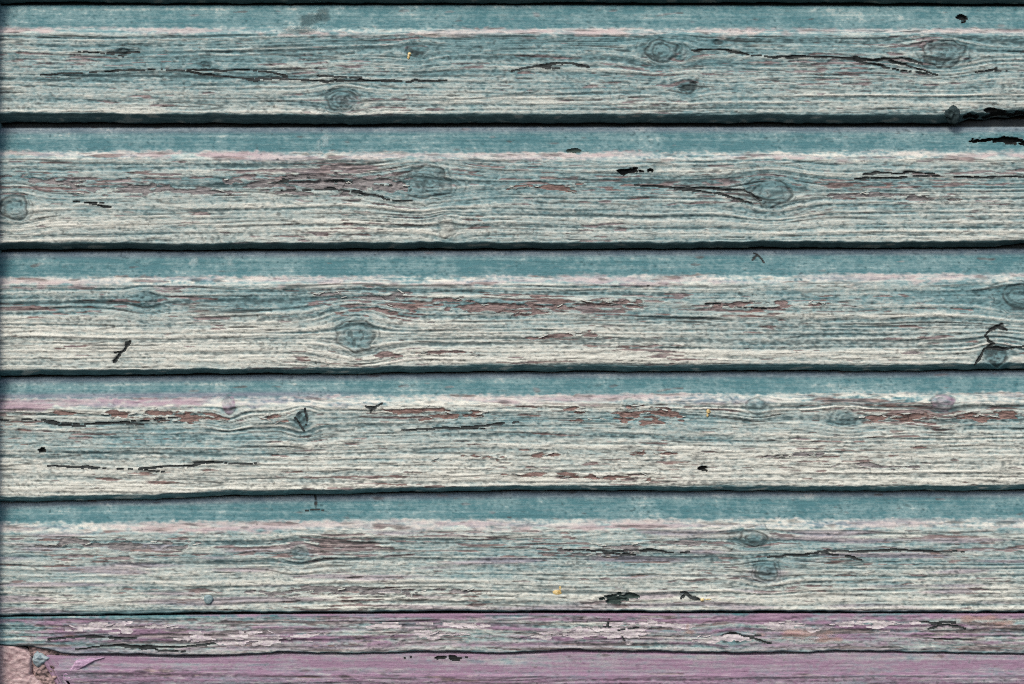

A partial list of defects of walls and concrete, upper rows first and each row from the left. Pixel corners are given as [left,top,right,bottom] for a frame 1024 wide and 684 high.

crack [40,51,447,83]
crack [691,49,938,76]
crack [634,184,762,203]
peeling [432,296,643,316]
crack [974,323,1024,365]
peeling [382,405,489,421]
crack [47,461,257,473]
crack [561,548,690,556]
spalling [599,592,640,604]
peeling [65,621,133,635]
peeling [145,624,329,646]
peeling [515,619,751,645]